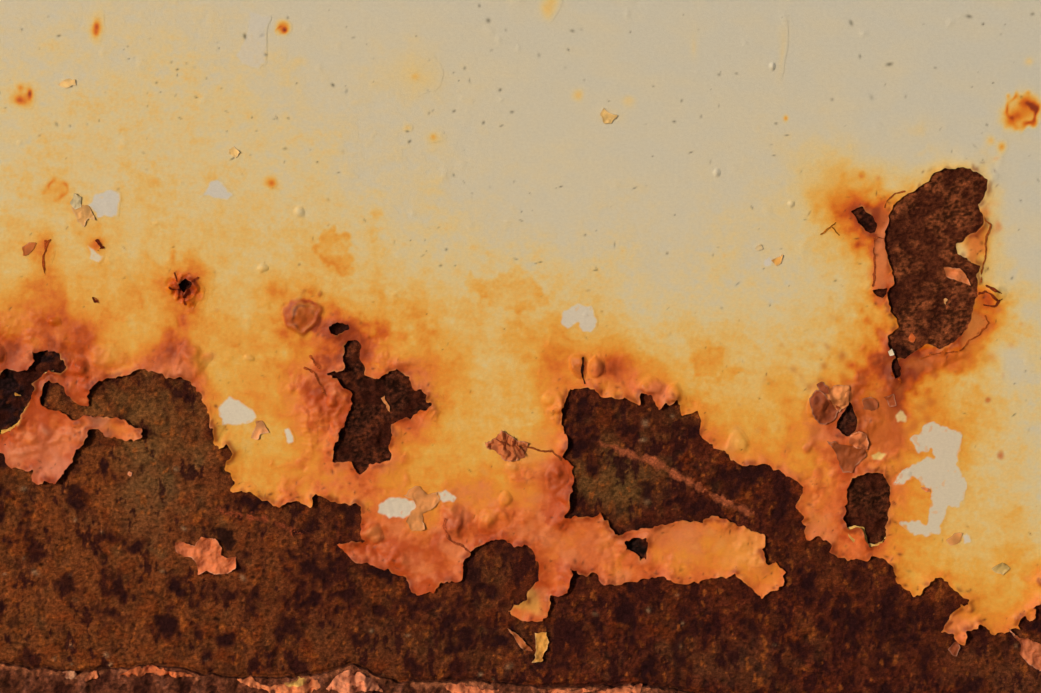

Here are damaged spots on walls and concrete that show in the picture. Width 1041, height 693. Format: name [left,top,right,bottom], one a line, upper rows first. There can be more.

corrosion [6,82,36,112]
corrosion [989,86,1041,158]
corrosion [40,170,74,205]
corrosion [785,144,910,269]
corrosion [142,252,215,344]
corrosion [268,278,361,367]
corrosion [306,220,361,284]
corrosion [457,258,556,320]
corrosion [973,257,1023,334]
corrosion [684,340,748,387]
corrosion [854,333,948,417]
peeling [0,332,1041,693]